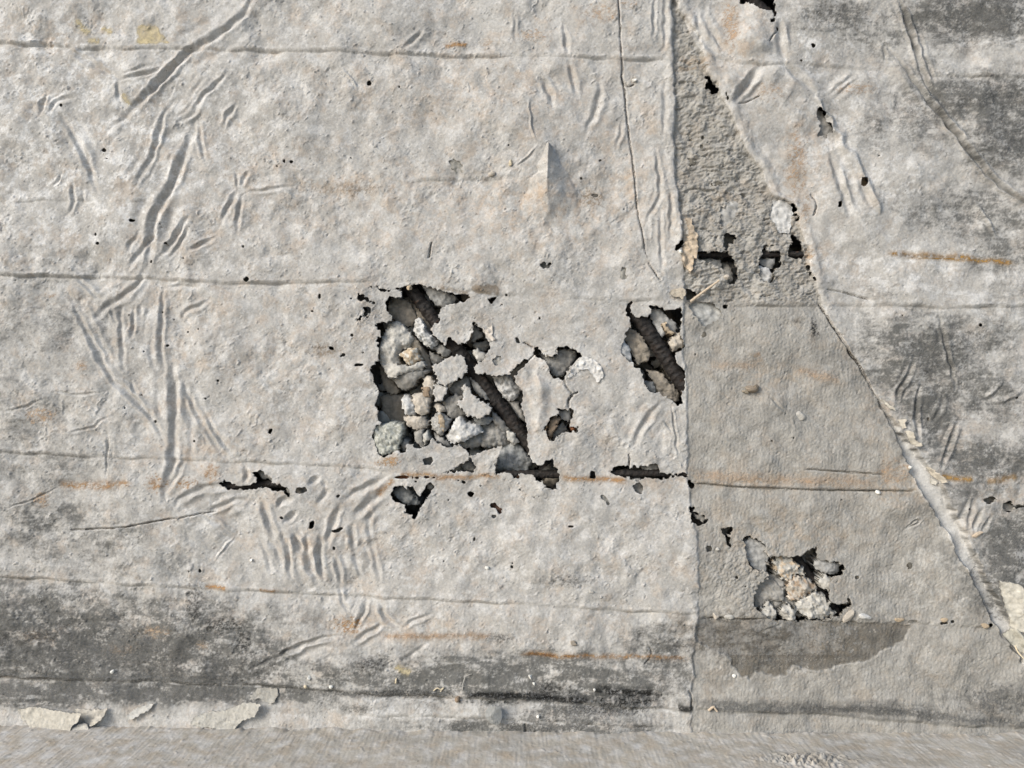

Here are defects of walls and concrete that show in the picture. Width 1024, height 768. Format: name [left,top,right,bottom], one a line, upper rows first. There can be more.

crack [618,0,659,279]
spalling [697,201,739,284]
rust [892,252,1012,264]
spalling [357,284,604,489]
spalling [621,288,723,405]
crack [817,289,876,396]
spalling [219,470,297,497]
spalling [393,476,434,515]
spalling [610,463,688,483]
crack [694,469,910,492]
spalling [721,527,852,622]
water stain [678,614,907,677]